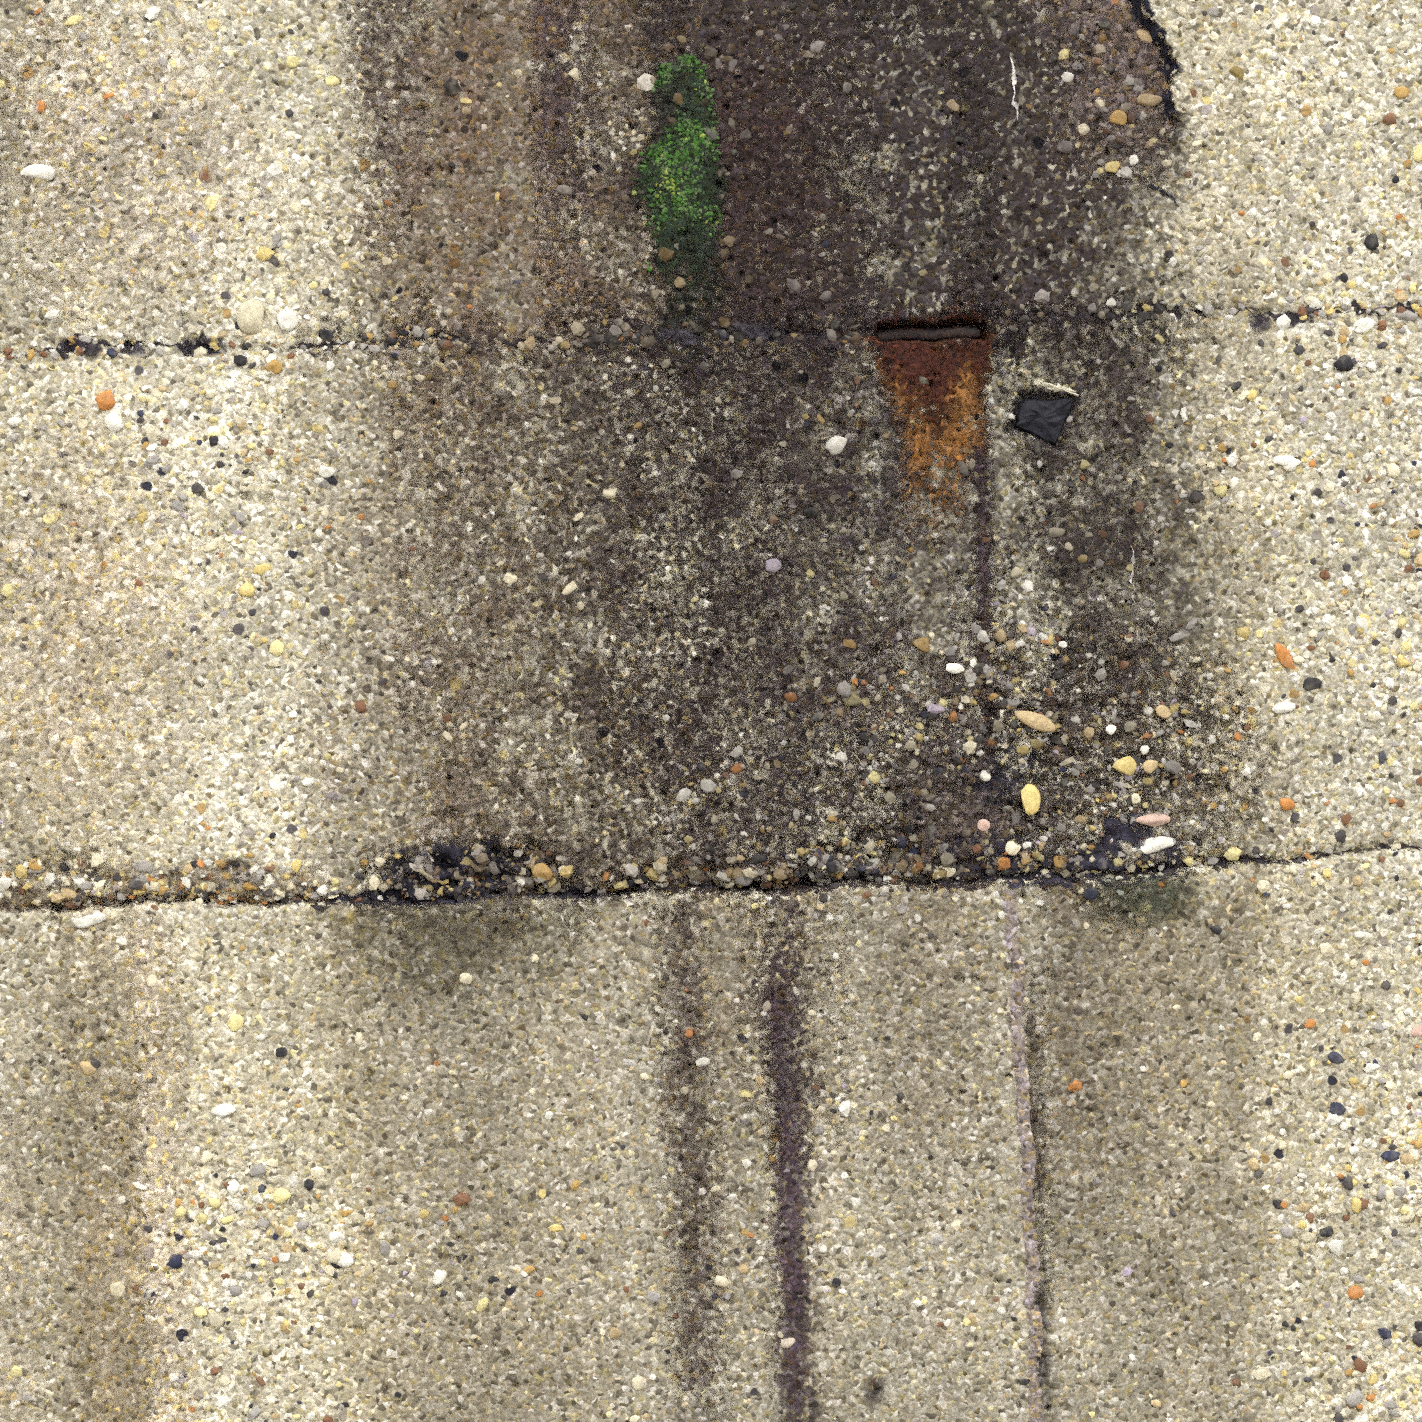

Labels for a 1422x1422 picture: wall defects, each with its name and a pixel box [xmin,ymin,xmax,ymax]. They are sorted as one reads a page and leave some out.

damp [358,0,1219,1422]
rust [869,308,992,500]